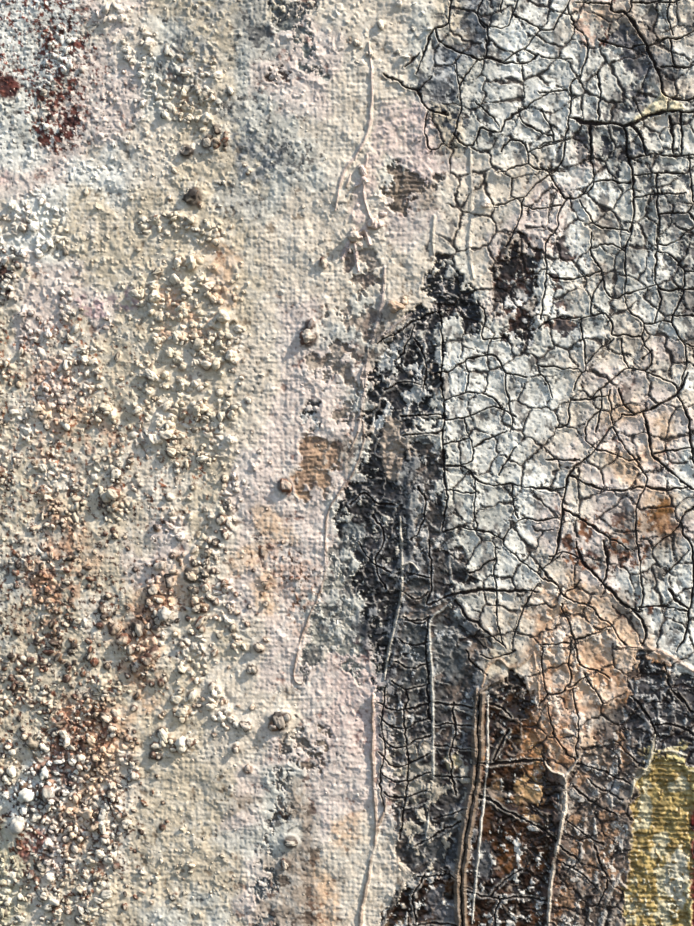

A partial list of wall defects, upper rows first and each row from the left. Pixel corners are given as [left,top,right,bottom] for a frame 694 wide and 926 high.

rust [0,0,91,148]
spalling [290,232,694,926]